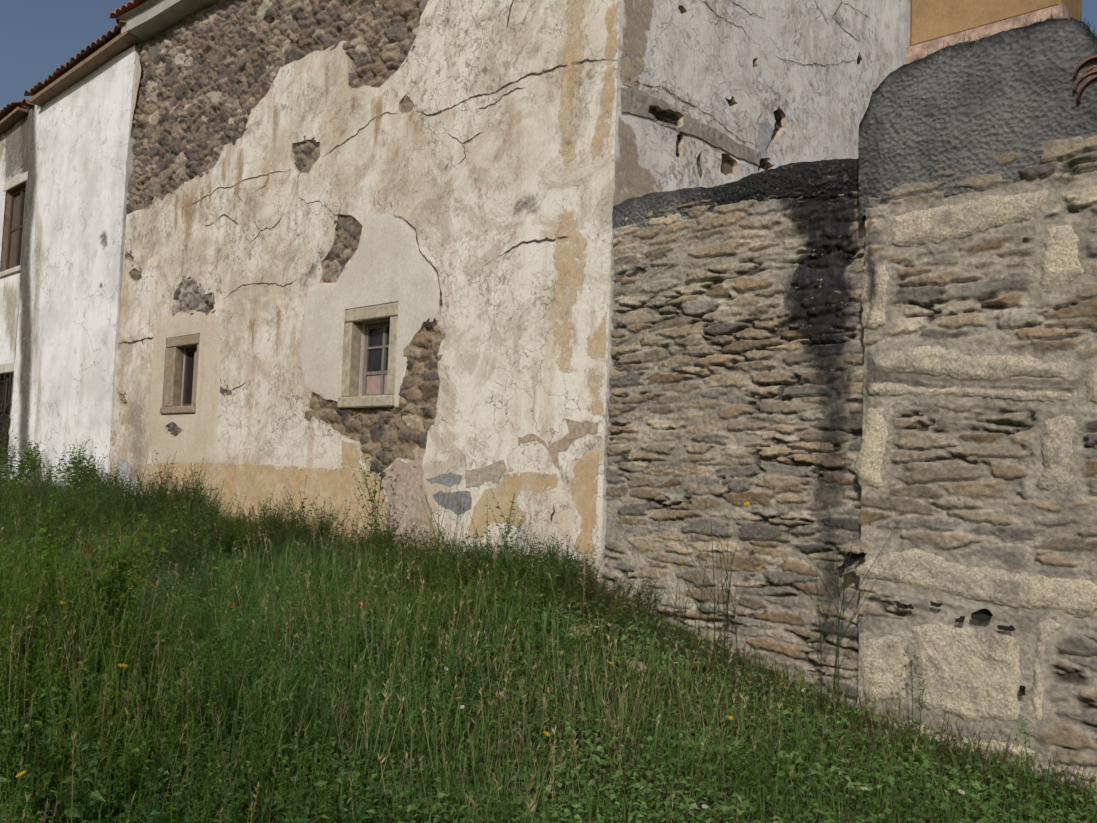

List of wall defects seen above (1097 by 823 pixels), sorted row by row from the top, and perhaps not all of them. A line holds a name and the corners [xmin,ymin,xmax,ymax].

flaking render [126,0,429,214]
crack [326,58,610,164]
peeling [590,0,787,205]
crack [635,81,756,146]
crack [183,170,289,240]
crack [227,276,295,296]
crack [390,213,442,321]
crack [501,236,568,256]
peeling [115,212,609,562]
damp [777,181,876,535]
peeling [838,552,868,578]
peeling [955,609,1016,631]